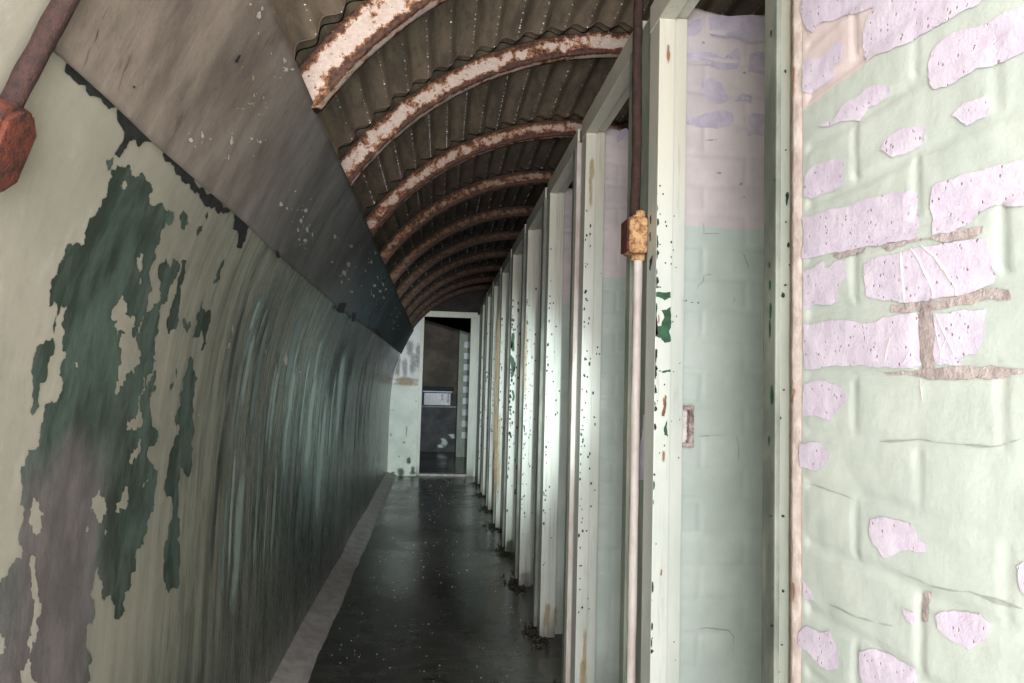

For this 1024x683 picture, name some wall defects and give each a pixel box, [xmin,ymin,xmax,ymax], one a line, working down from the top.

peeling [800,0,1024,94]
peeling [818,85,890,127]
peeling [951,95,990,126]
peeling [880,126,925,157]
peeling [787,158,1024,421]
peeling [639,185,680,504]
peeling [0,158,211,683]
crack [879,439,1020,448]
peeling [869,517,926,558]
peeling [902,592,990,650]
peeling [798,625,838,670]
peeling [858,648,916,683]